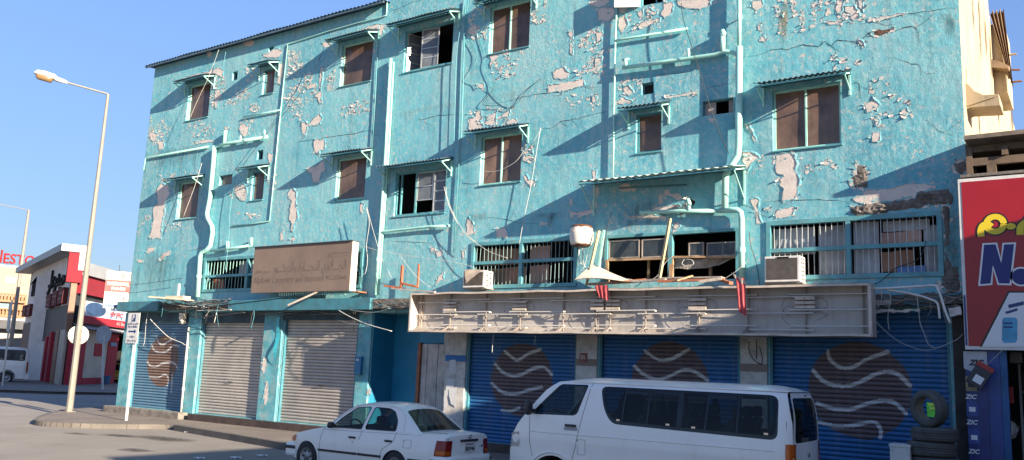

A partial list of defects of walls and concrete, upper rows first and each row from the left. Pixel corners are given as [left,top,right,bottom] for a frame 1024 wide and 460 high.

peeling [476,49,524,91]
peeling [547,0,713,111]
peeling [750,0,907,71]
crack [744,8,945,57]
peeling [147,116,170,151]
peeling [243,40,336,184]
peeling [341,99,371,117]
peeling [467,106,518,130]
peeling [862,76,914,143]
peeling [136,167,201,263]
peeling [265,152,300,244]
spalling [741,122,963,317]